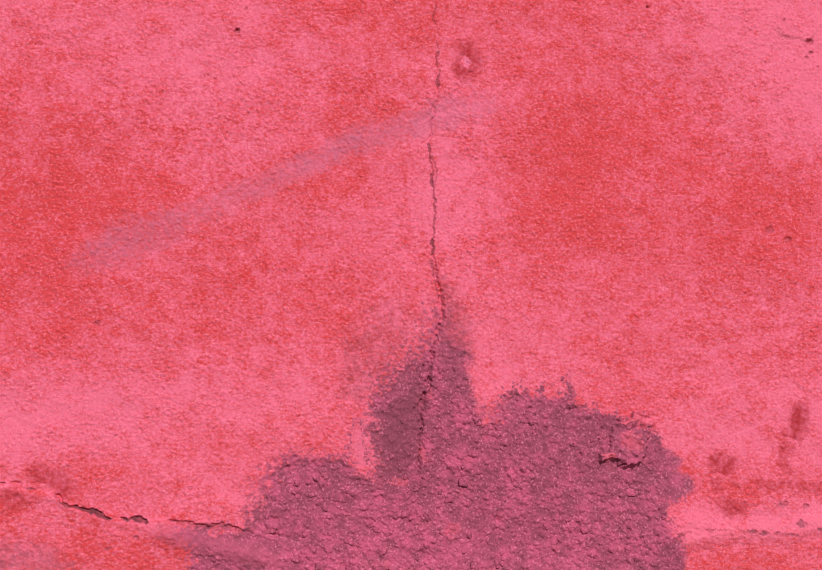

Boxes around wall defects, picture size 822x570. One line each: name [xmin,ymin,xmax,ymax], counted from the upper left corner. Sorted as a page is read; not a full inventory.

crack [432,0,441,89]
crack [422,143,438,256]
leakage [310,245,490,499]
crack [58,501,253,534]